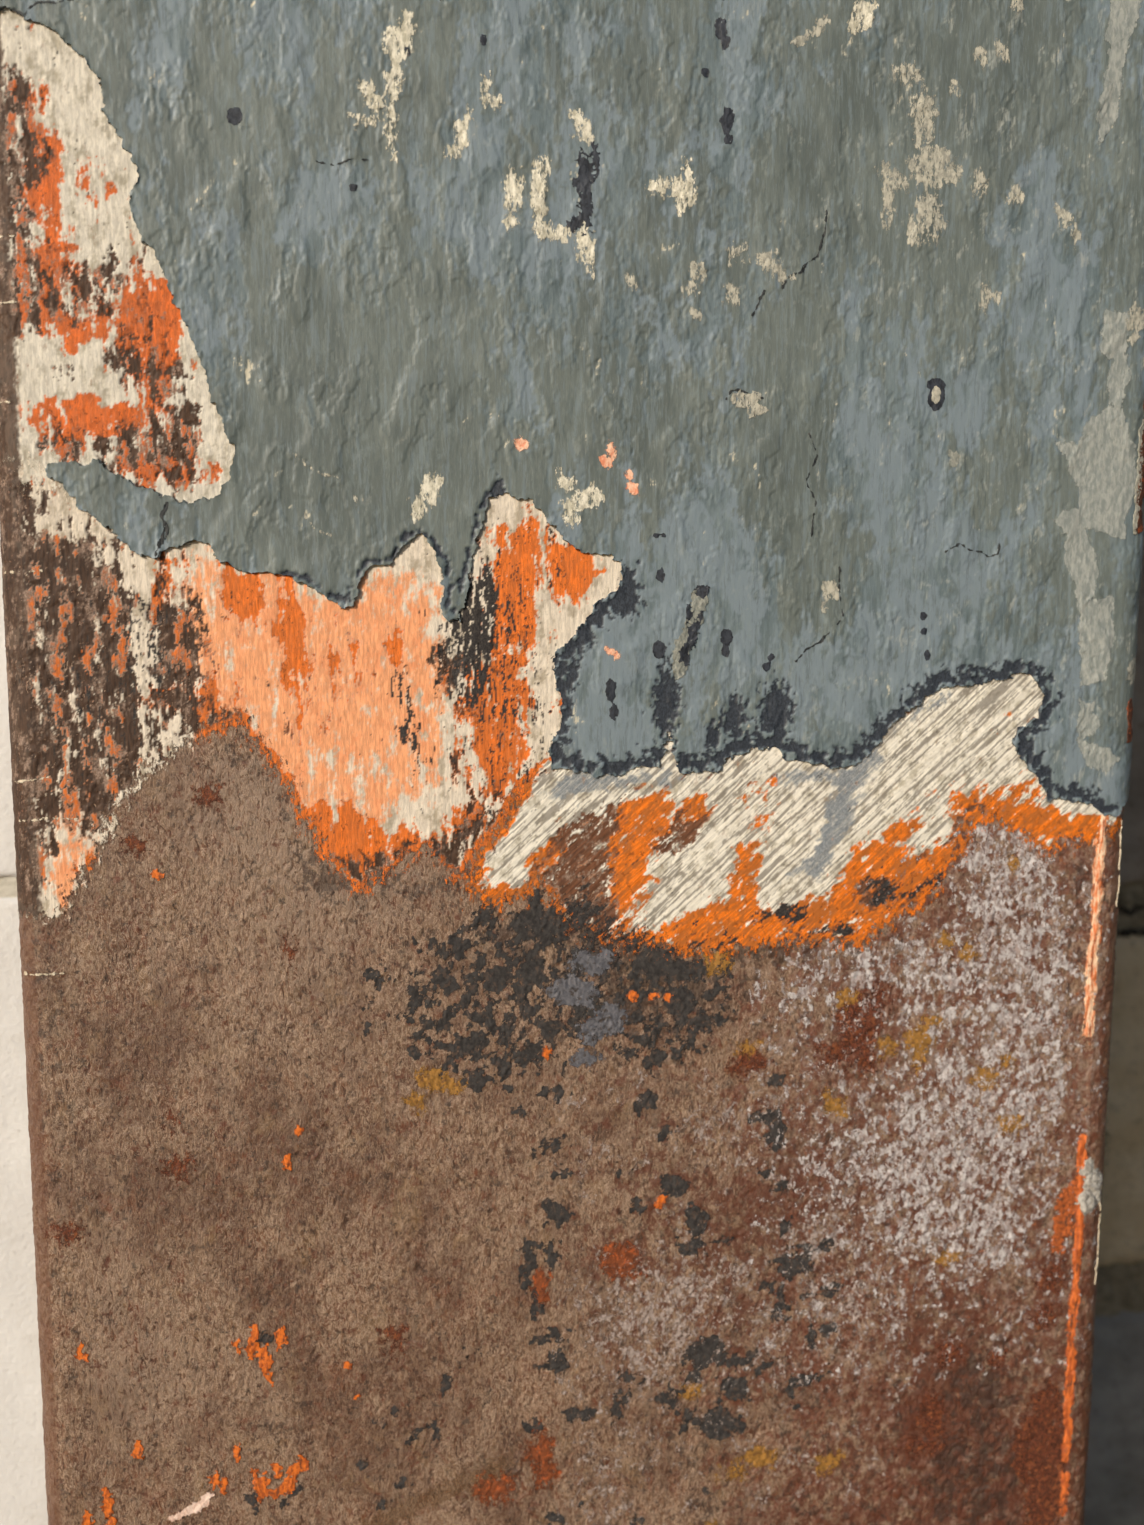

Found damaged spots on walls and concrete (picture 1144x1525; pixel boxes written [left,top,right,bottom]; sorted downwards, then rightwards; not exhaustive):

peeling [0,0,1124,961]
corrosion [190,780,227,812]
corrosion [119,834,151,859]
corrosion [719,1047,774,1084]
corrosion [813,978,893,1082]
corrosion [155,1105,196,1187]
corrosion [43,1218,91,1251]
corrosion [598,1236,647,1286]
corrosion [1026,1176,1085,1333]
corrosion [374,1310,409,1365]
corrosion [471,1420,565,1508]
corrosion [1008,1379,1072,1525]